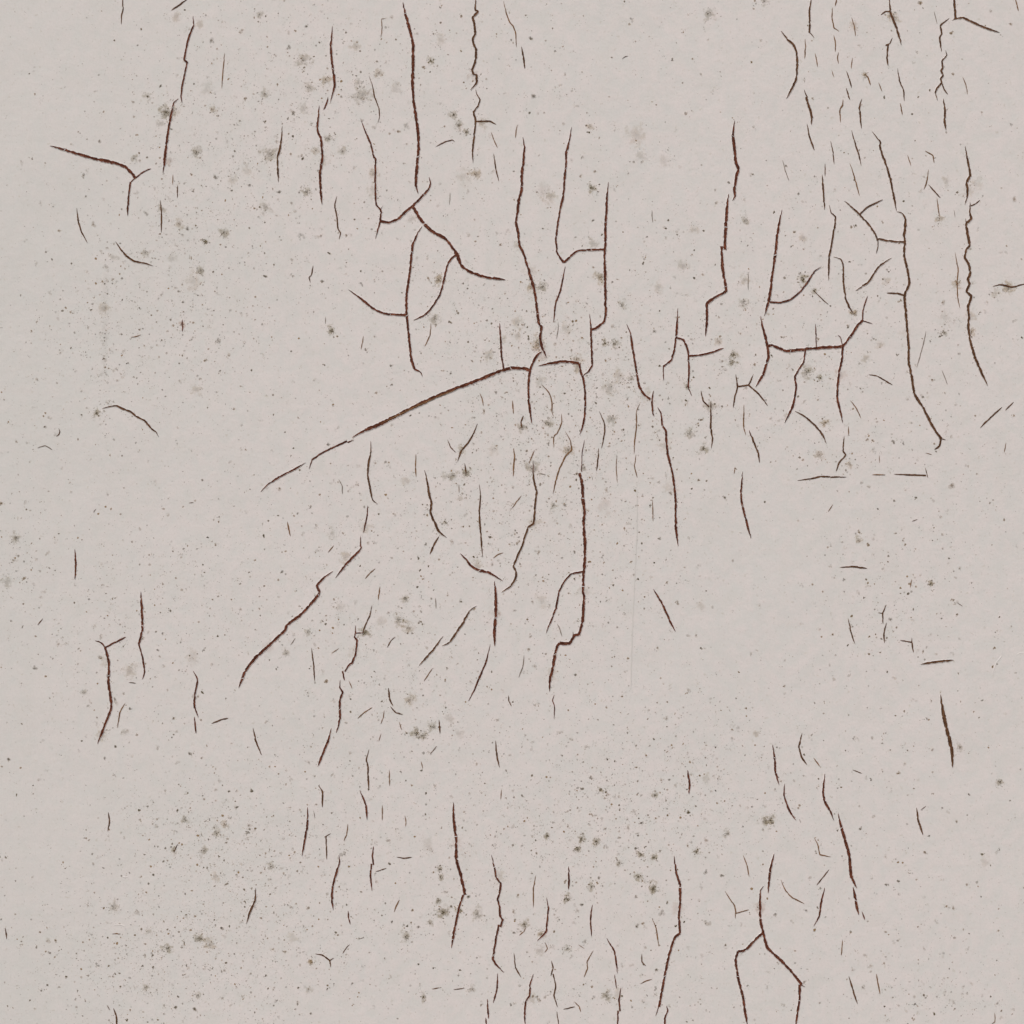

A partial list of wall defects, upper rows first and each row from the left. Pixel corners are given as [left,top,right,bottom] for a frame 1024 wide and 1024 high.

crack [50,0,195,231]
crack [115,241,153,266]
crack [102,405,159,436]
crack [238,0,1024,967]
crack [97,592,145,744]
crack [485,855,581,1024]
crack [726,734,865,1024]
crack [841,940,880,1004]